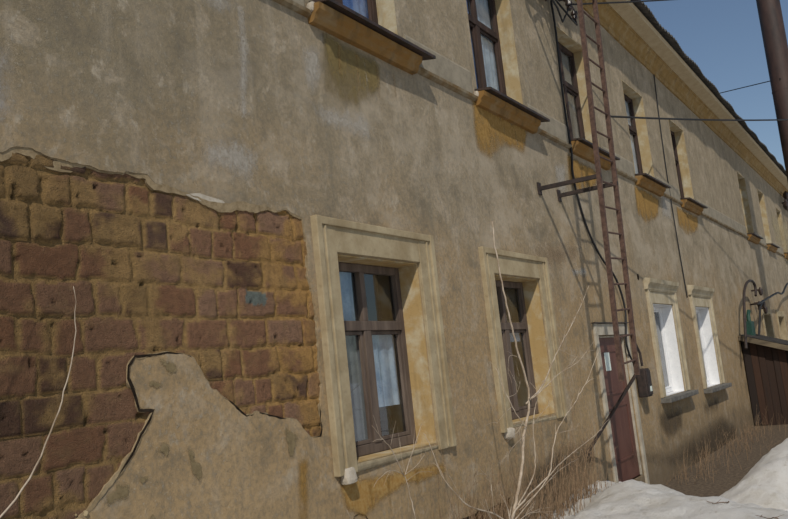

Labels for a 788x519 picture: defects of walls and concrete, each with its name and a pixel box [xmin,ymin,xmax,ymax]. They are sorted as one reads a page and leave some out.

spalling [0,147,323,519]